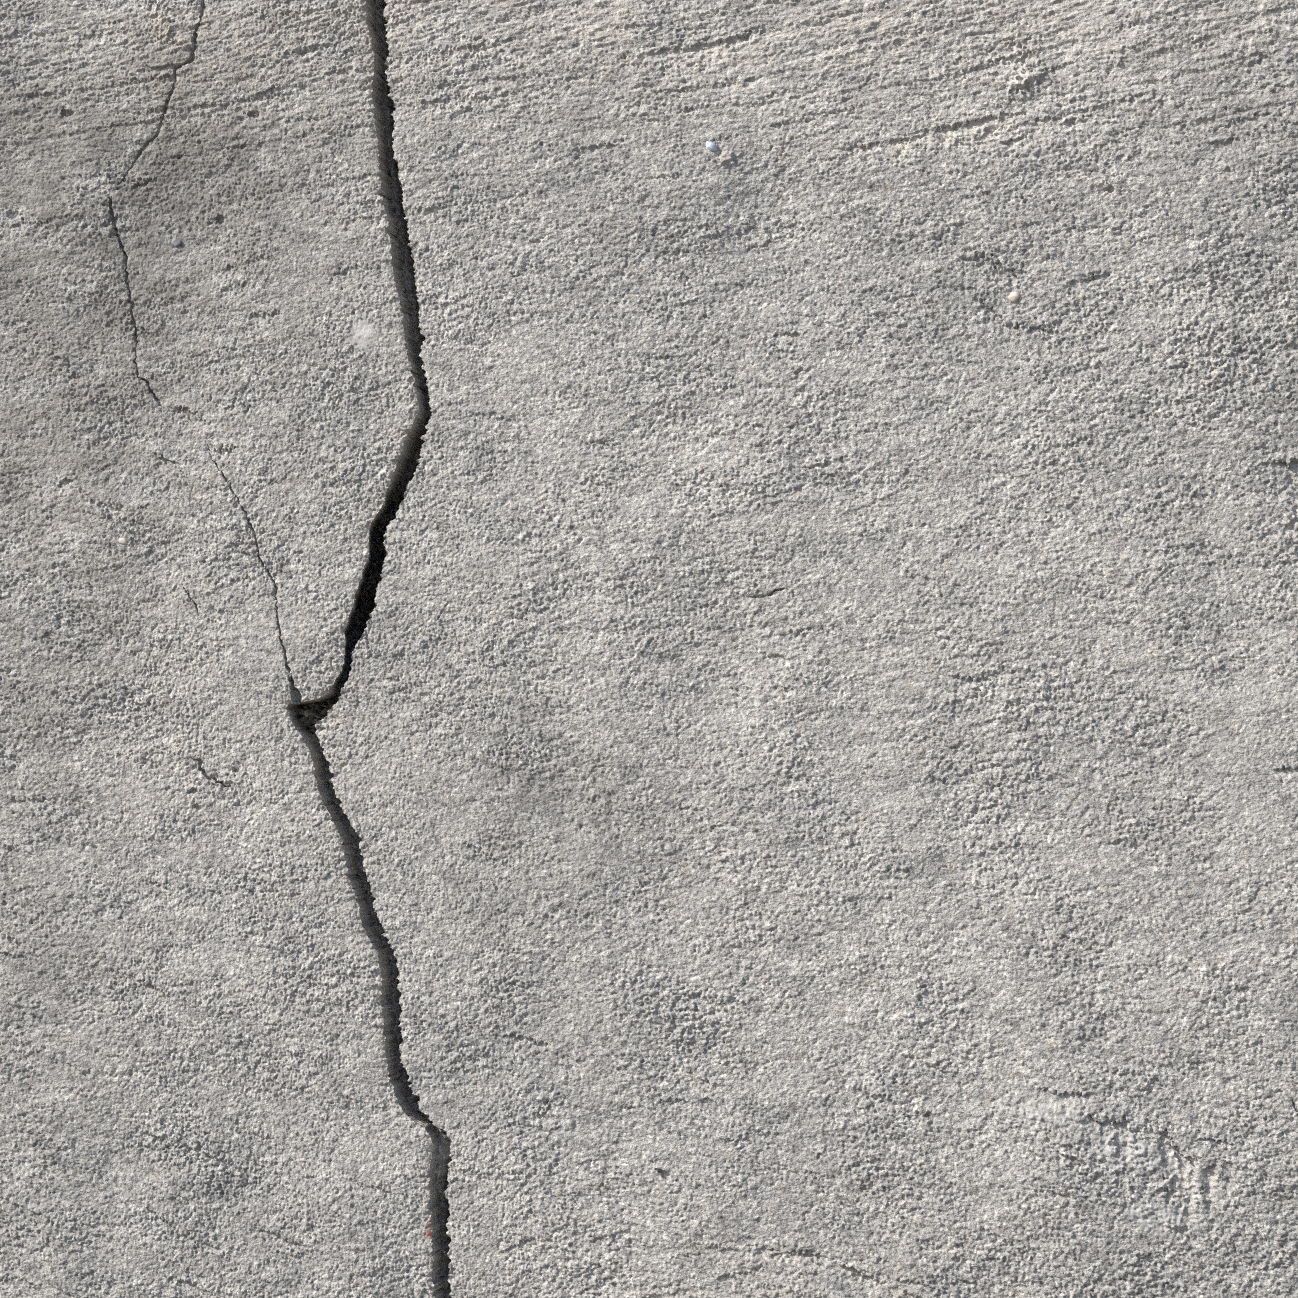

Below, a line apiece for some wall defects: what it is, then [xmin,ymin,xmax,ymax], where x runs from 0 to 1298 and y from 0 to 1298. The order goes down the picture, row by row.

crack [109,0,206,408]
crack [182,584,199,616]
crack [188,758,239,812]
crack [204,0,452,1298]